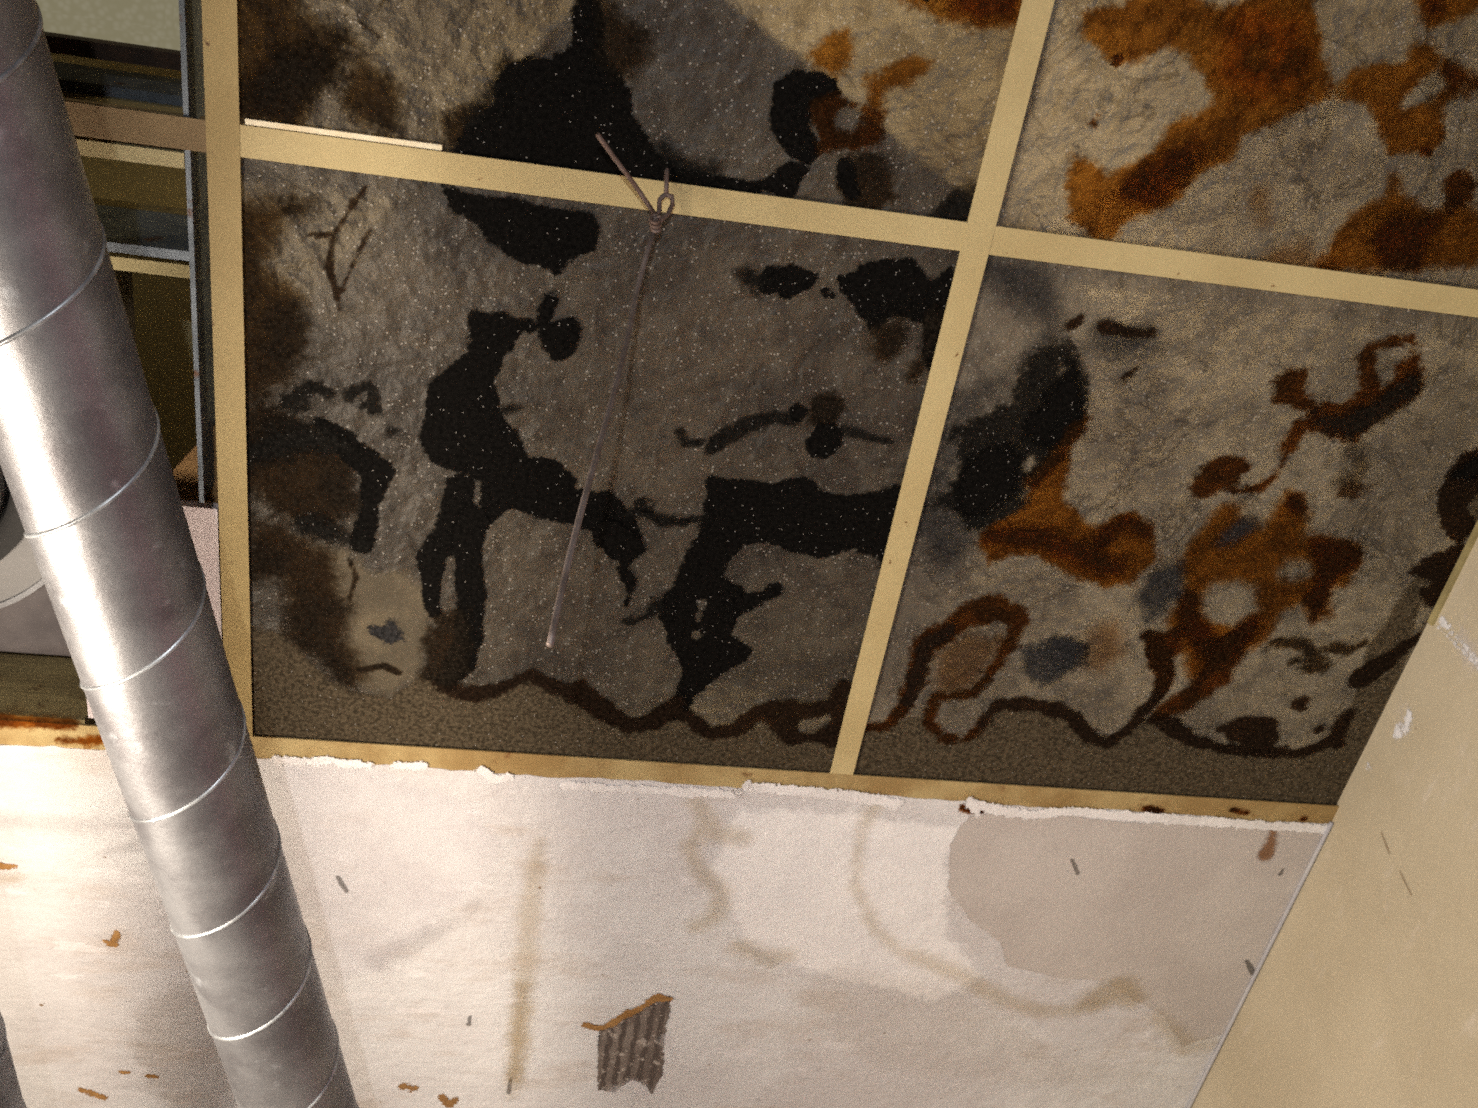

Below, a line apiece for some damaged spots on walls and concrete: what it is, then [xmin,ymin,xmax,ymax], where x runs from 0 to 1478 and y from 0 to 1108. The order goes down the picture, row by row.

water stain [237,0,401,136]
water stain [451,0,896,210]
water stain [930,180,977,222]
water stain [736,257,954,384]
water stain [242,184,901,773]
water stain [920,313,1158,562]
water stain [853,447,1478,805]
peeling [581,993,674,1094]